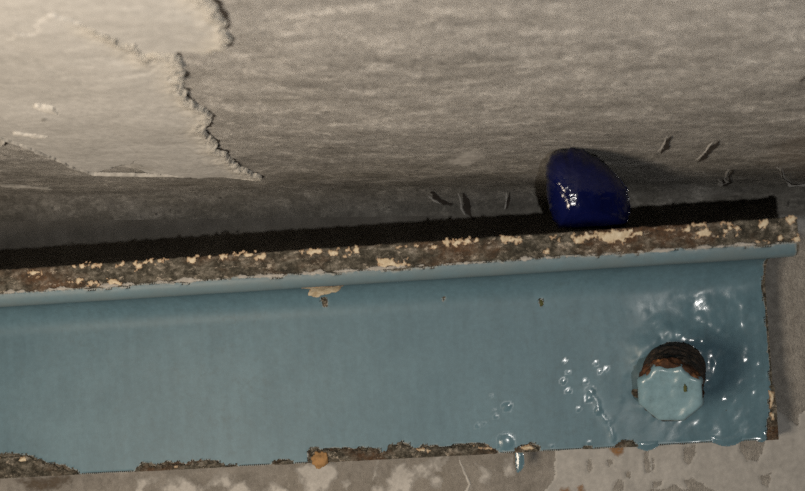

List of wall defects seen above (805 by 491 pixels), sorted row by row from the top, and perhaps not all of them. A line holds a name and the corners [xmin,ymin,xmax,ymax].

peeling [0,0,265,182]
corrosion [639,357,705,398]
corrosion [0,453,78,490]
corrosion [140,460,232,472]
corrosion [308,442,496,463]
corrosion [513,443,538,453]